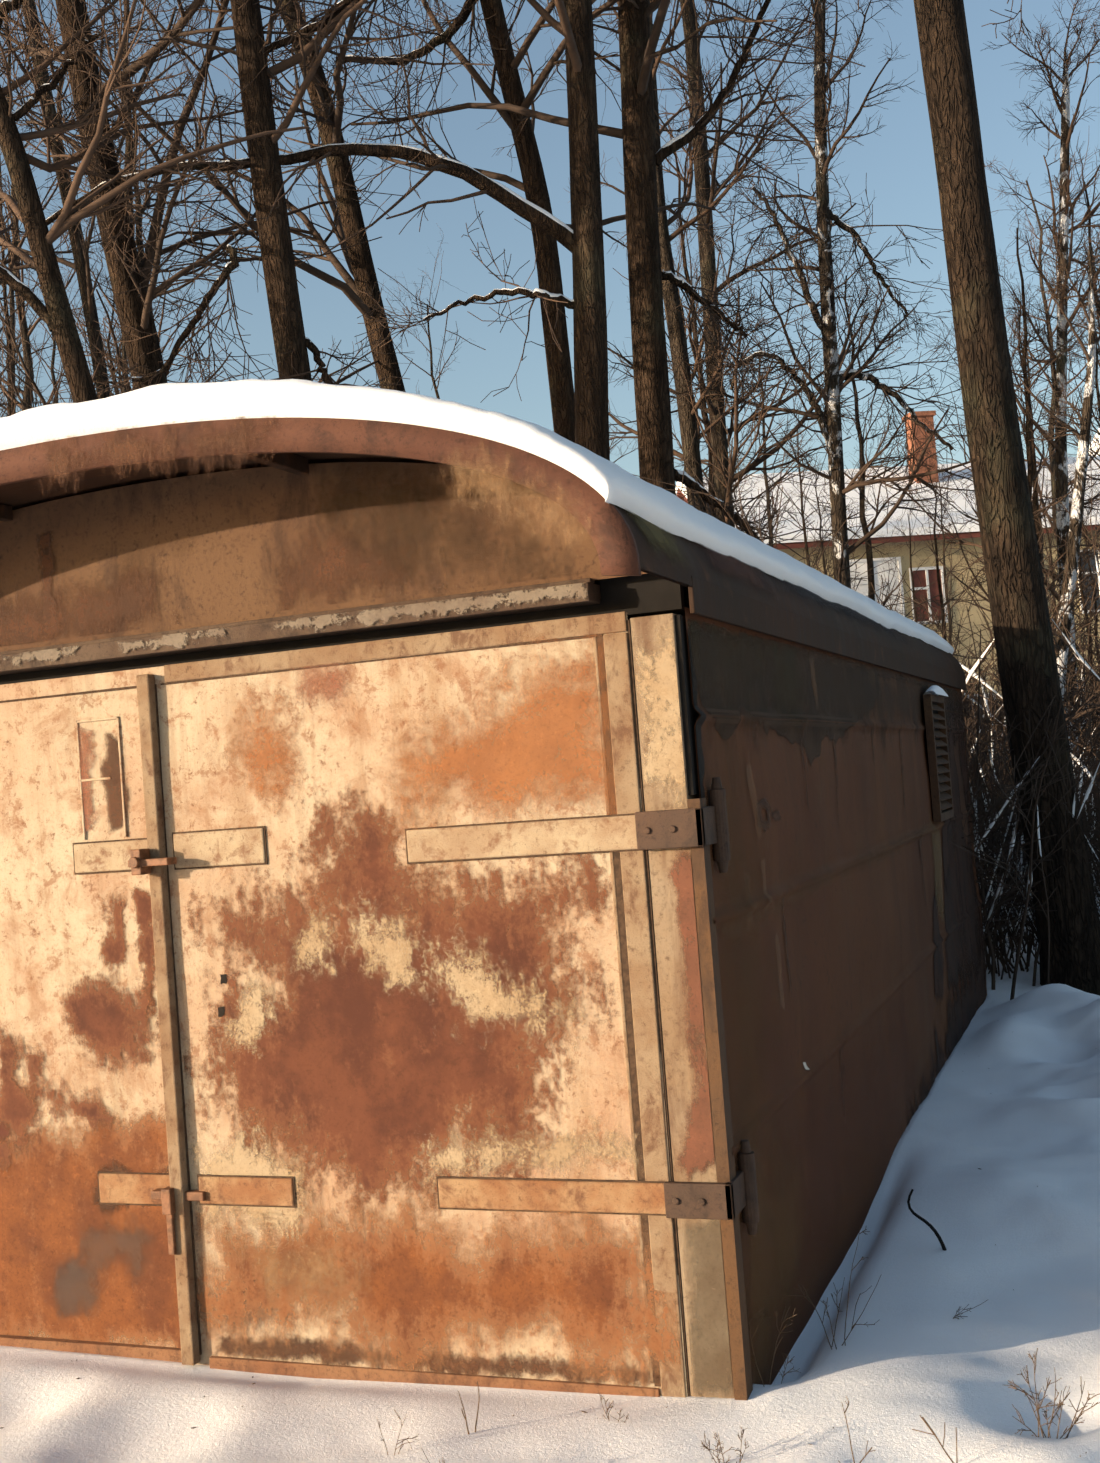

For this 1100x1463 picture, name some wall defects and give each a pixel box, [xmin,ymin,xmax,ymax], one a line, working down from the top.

corrosion [230,697,296,803]
corrosion [301,665,347,700]
corrosion [395,635,617,825]
corrosion [901,703,987,1138]
corrosion [0,1111,181,1348]
corrosion [195,1194,681,1386]